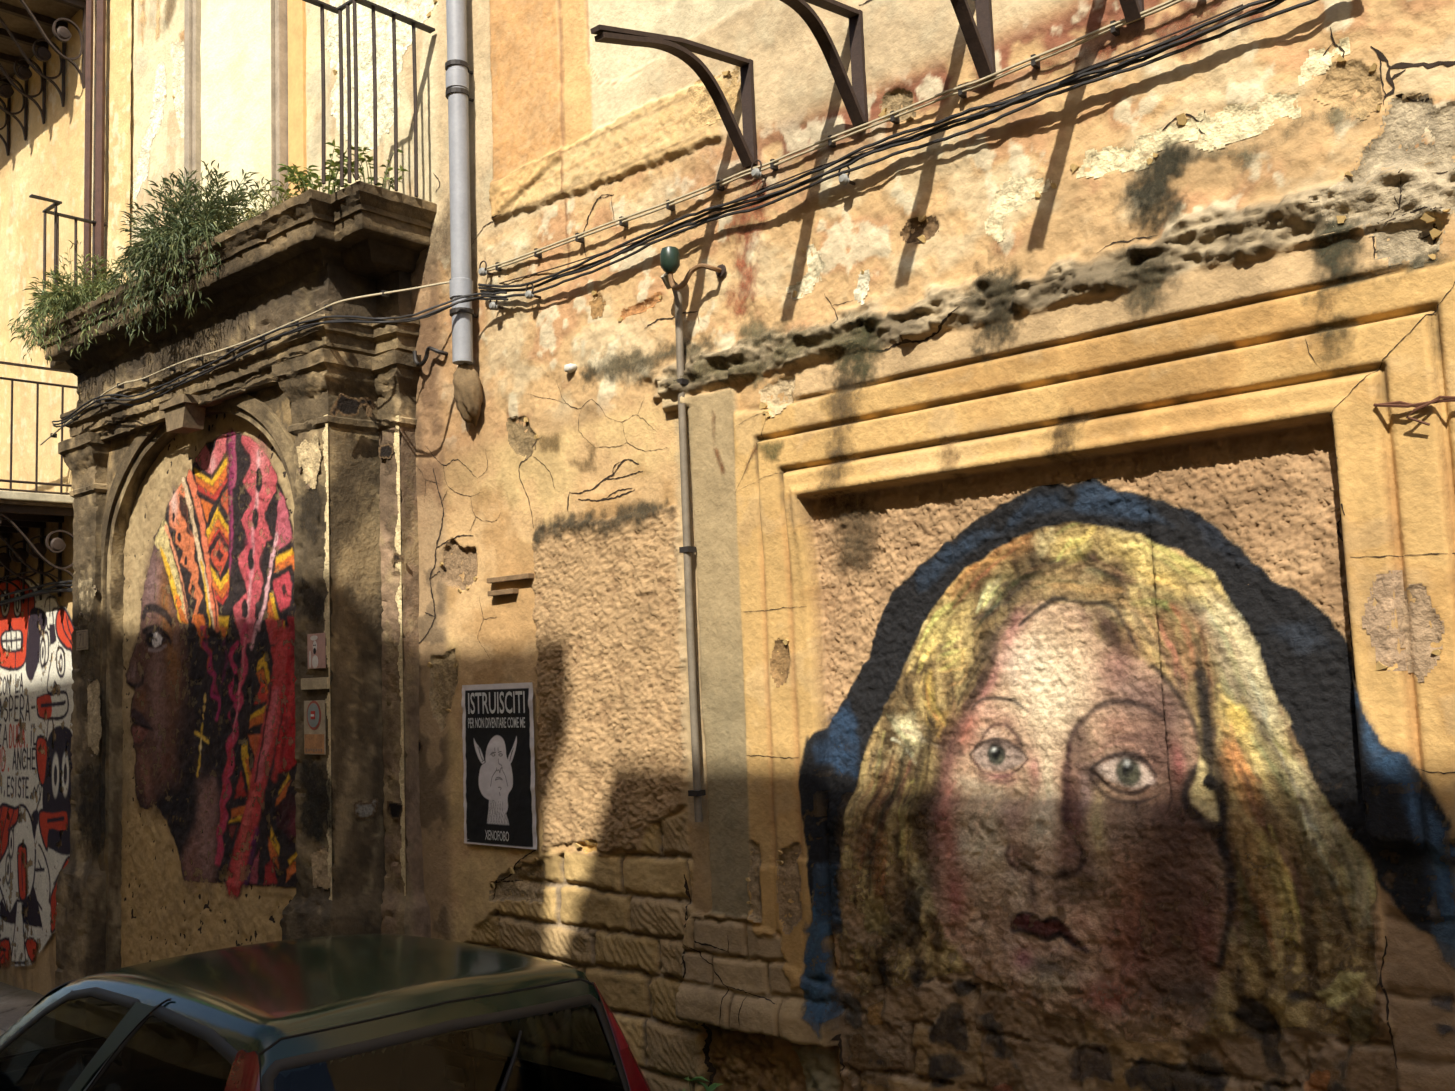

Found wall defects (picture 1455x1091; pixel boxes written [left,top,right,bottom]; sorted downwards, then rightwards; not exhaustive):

water stain [1326,108,1361,125]
flaking render [1070,37,1455,268]
flaking render [900,215,939,244]
flaking render [985,175,1057,243]
flaking render [786,243,826,300]
flaking render [854,269,870,305]
flaking render [506,415,538,460]
crack [419,381,667,643]
flaking render [439,537,478,593]
flaking render [575,838,598,854]
flaking render [489,857,549,905]
flaking render [746,840,802,935]